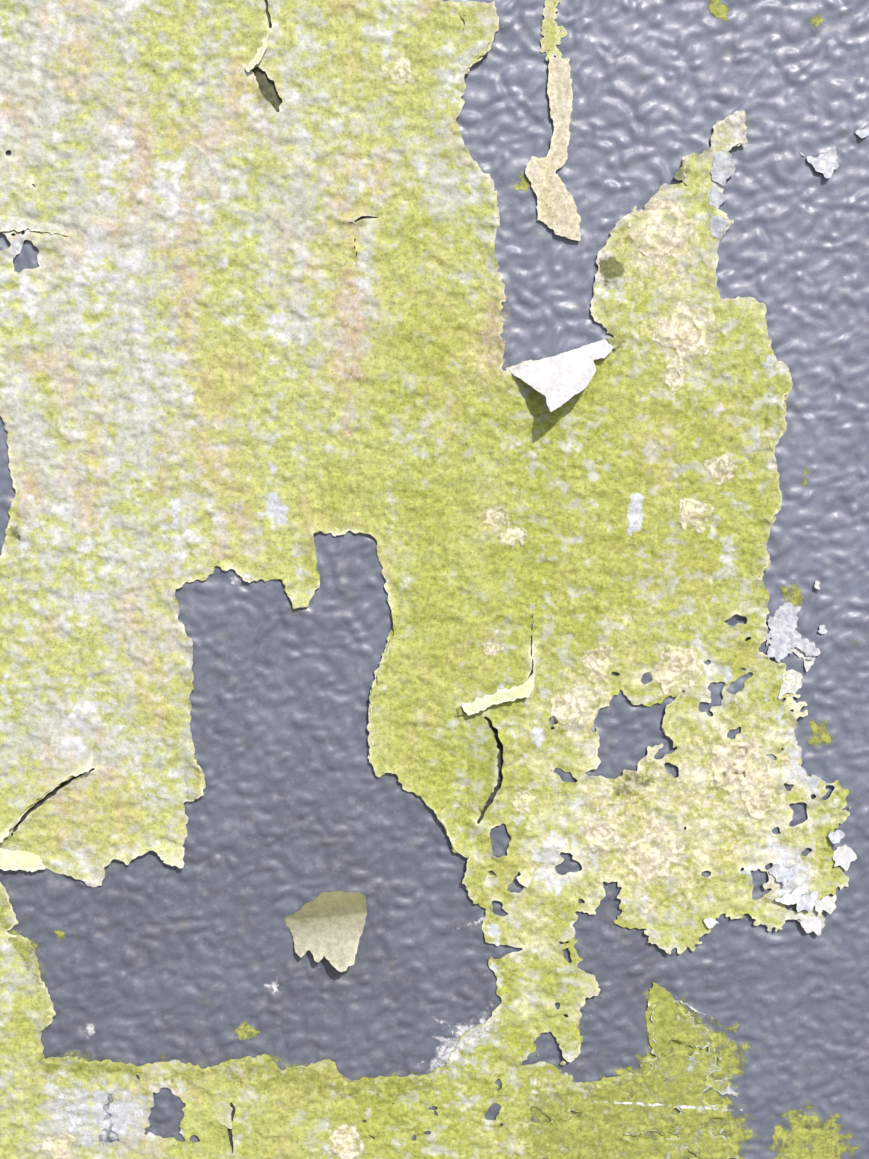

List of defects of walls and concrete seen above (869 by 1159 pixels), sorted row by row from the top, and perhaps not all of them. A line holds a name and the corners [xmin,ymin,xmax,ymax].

crack [245,0,282,112]
peeling [525,0,581,241]
peeling [0,215,68,273]
peeling [506,334,626,412]
peeling [0,416,16,556]
peeling [766,602,827,699]
crack [456,615,535,824]
peeling [593,690,685,777]
peeling [0,531,532,1081]
peeling [769,862,836,936]
peeling [828,830,857,871]
peeling [144,1087,186,1138]